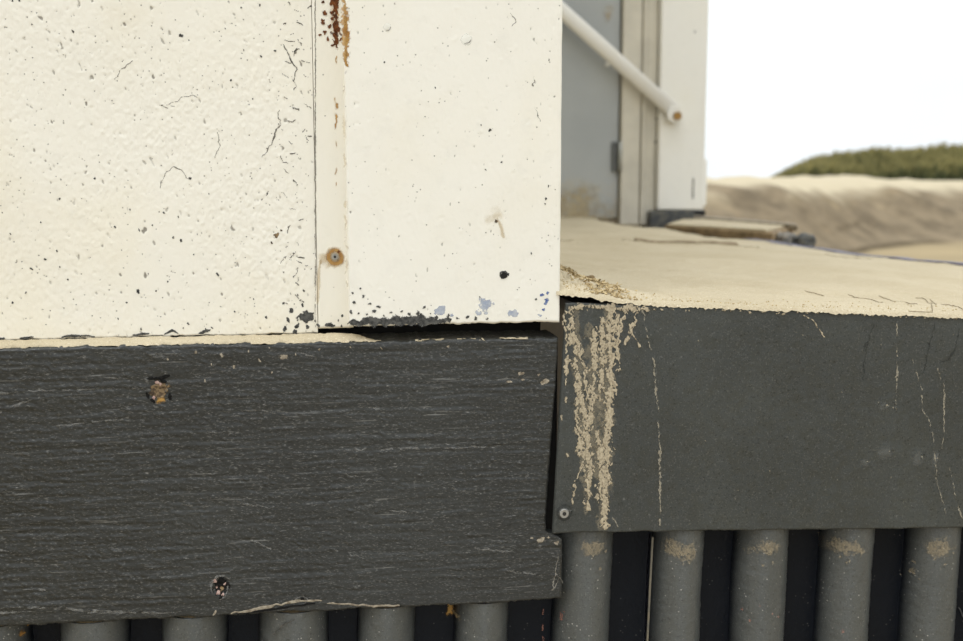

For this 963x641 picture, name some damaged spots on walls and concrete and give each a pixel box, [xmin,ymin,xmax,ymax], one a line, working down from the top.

corrosion [318,0,350,67]
crack [895,324,963,519]